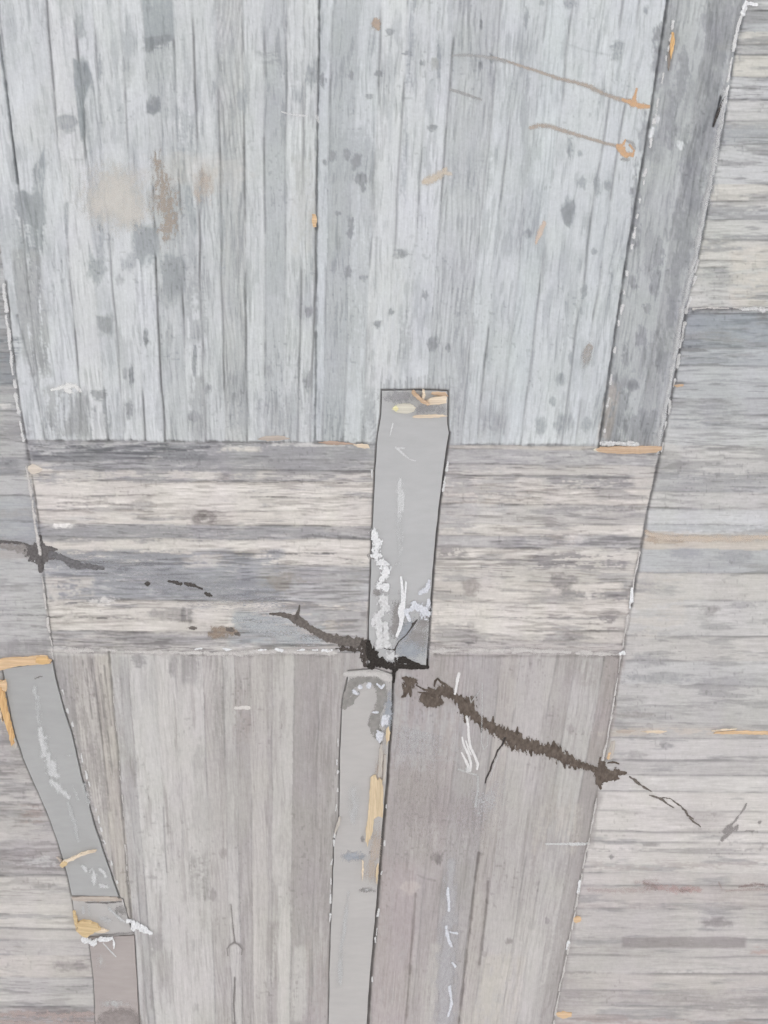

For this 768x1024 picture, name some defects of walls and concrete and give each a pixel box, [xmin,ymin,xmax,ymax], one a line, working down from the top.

rust [452,53,651,111]
rust [528,123,636,162]
crack [0,535,105,573]
crack [145,580,213,597]
damp [367,527,434,663]
crack [269,605,368,667]
crack [401,676,761,842]